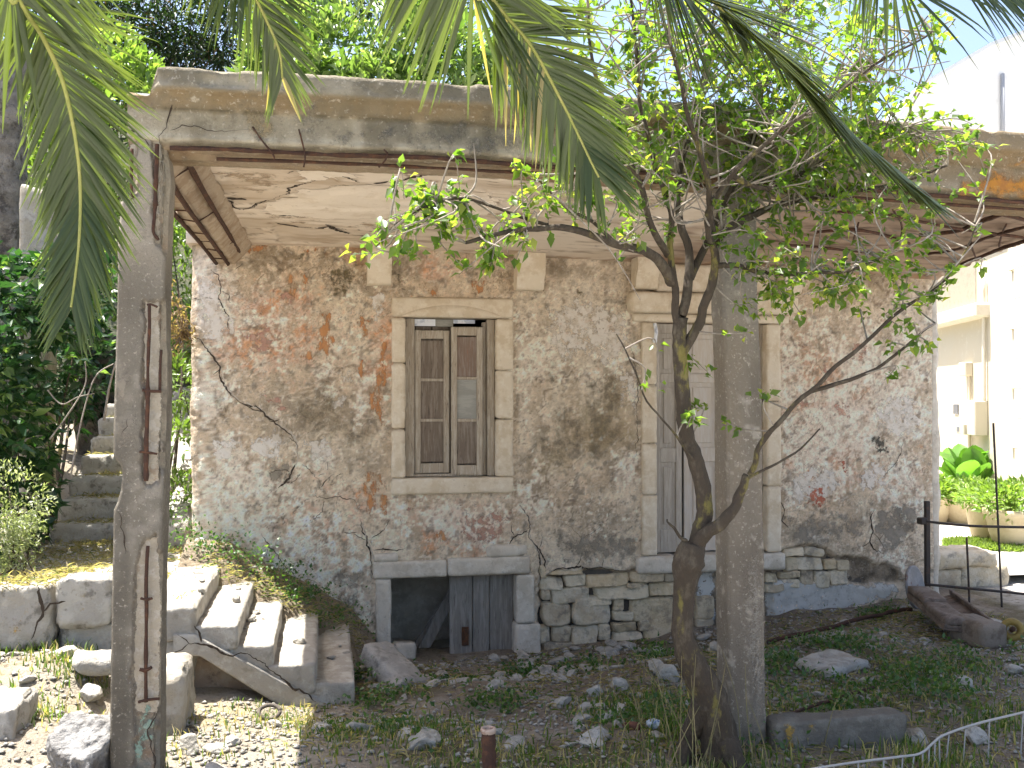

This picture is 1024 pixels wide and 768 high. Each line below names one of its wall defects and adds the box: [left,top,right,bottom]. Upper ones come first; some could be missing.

crack [227,171,392,239]
peeling [151,127,556,241]
spalling [623,170,724,189]
rust [961,171,1024,198]
peeling [212,428,282,461]
crack [194,336,403,578]
leakage [542,377,620,459]
peeling [876,392,923,436]
crack [510,505,634,589]
crack [31,585,65,639]
flaking render [742,465,863,729]
crack [173,626,316,702]